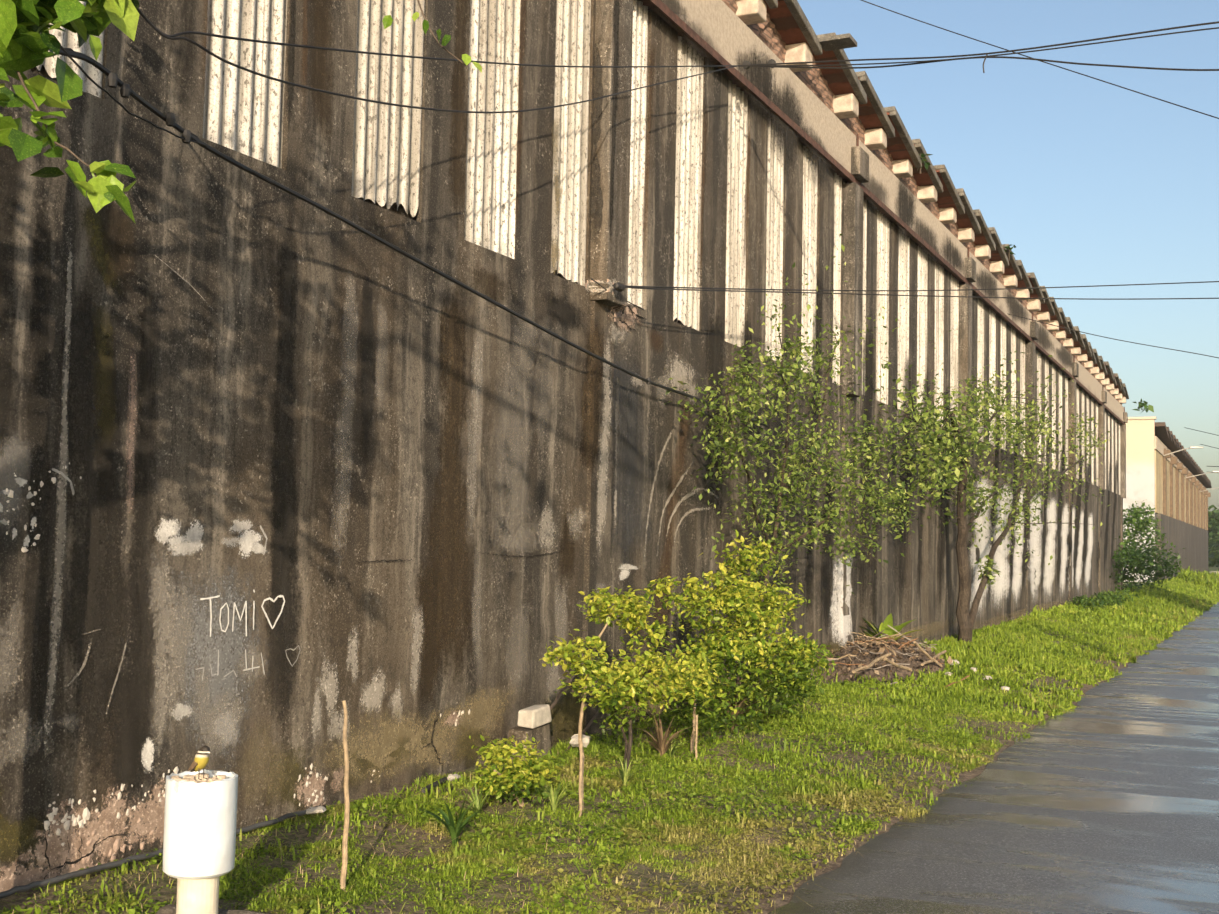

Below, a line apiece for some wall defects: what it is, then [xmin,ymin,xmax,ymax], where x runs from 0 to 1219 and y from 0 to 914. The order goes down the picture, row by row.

water stain [450,0,469,214]
water stain [589,0,620,236]
water stain [737,49,831,179]
water stain [866,178,964,270]
water stain [22,202,301,799]
water stain [311,277,483,741]
water stain [548,295,724,560]
water stain [805,282,834,628]
water stain [857,329,878,625]
water stain [894,359,950,600]
water stain [1009,436,1118,597]
flaking render [0,766,179,892]